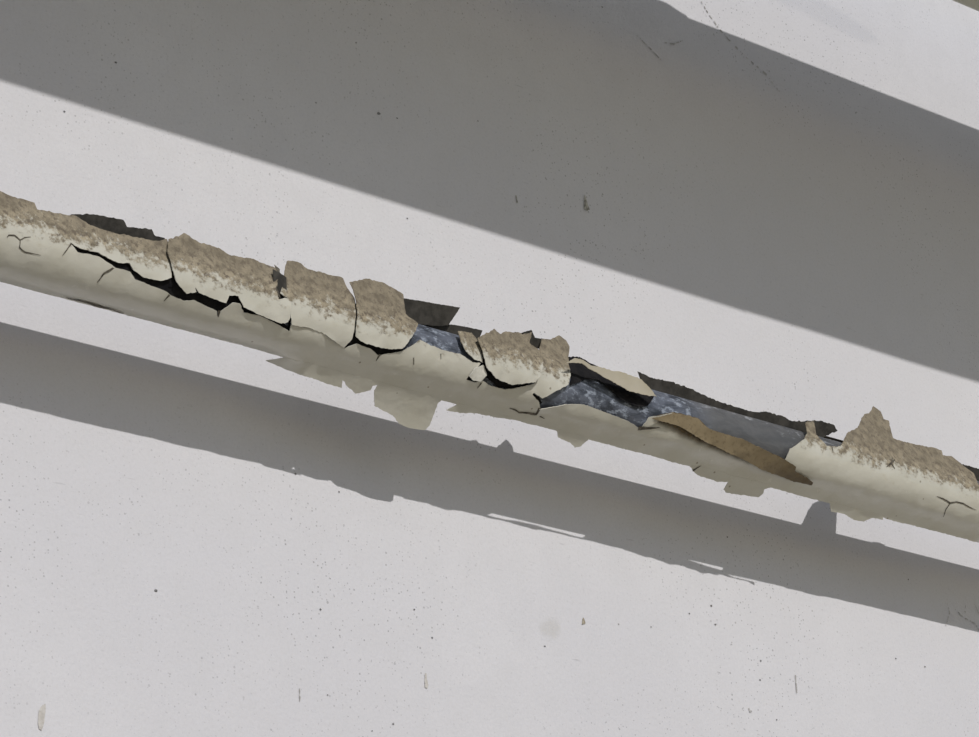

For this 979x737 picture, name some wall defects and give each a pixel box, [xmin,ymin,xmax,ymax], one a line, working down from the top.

crack [7,235,39,255]
crack [62,243,291,331]
peeling [71,214,543,385]
peeling [266,357,514,430]
peeling [566,356,837,437]
peeling [551,428,588,447]
peeling [652,413,813,497]
peeling [829,502,883,522]
crack [937,496,975,517]